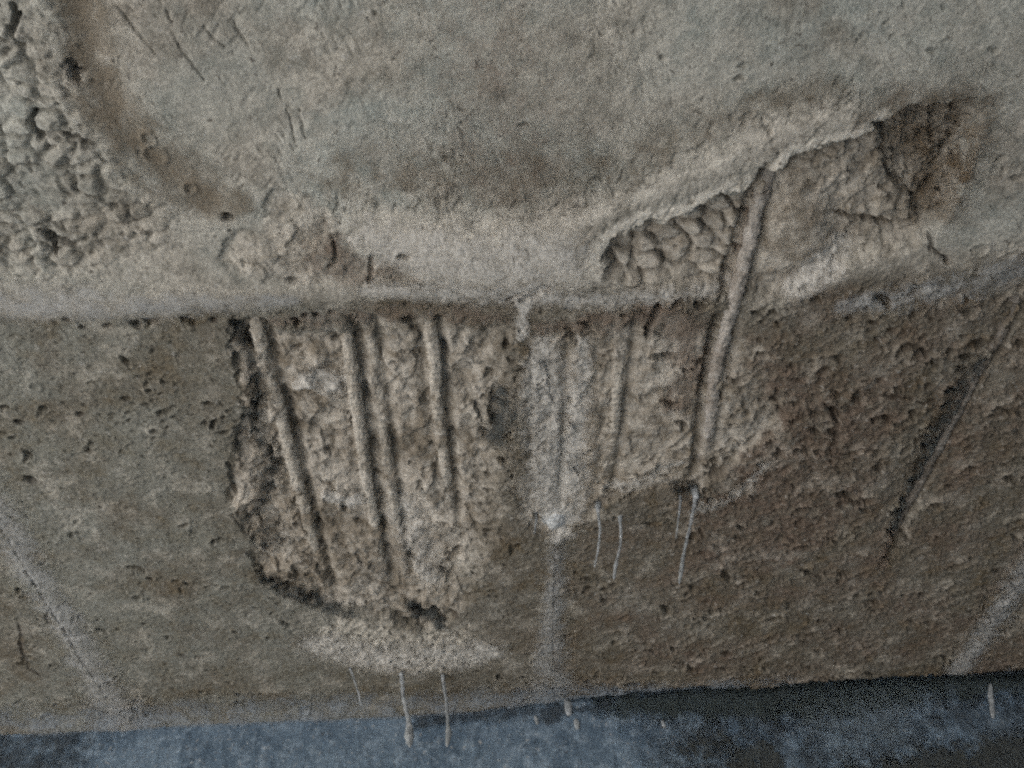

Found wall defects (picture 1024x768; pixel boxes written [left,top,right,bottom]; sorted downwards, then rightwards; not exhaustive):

leakage [349,223,724,543]
spalling [217,97,985,635]
crack [884,392,937,406]
leakage [413,643,623,728]